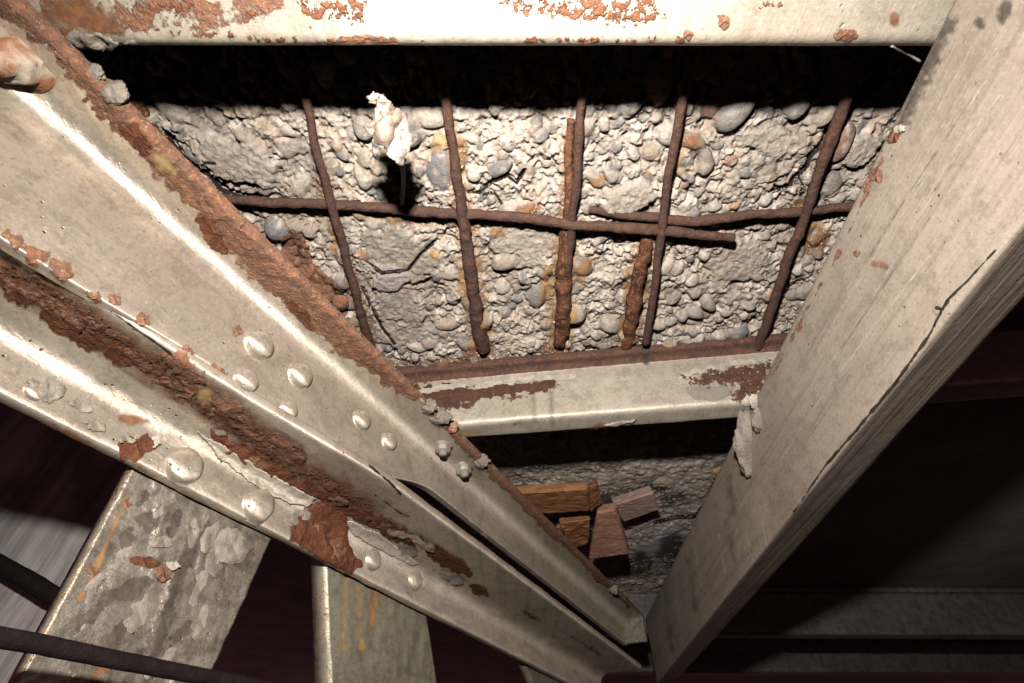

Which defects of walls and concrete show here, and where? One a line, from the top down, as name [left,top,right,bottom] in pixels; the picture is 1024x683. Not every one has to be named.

corrosion [488,0,666,45]
peeling [998,2,1011,22]
spalling [65,18,954,367]
corrosion [675,135,700,166]
corrosion [860,157,884,206]
corrosion [886,126,902,143]
corrosion [795,200,861,266]
corrosion [0,0,633,651]
corrosion [618,242,653,348]
corrosion [678,353,784,407]
crack [793,249,996,512]
peeling [197,430,316,507]